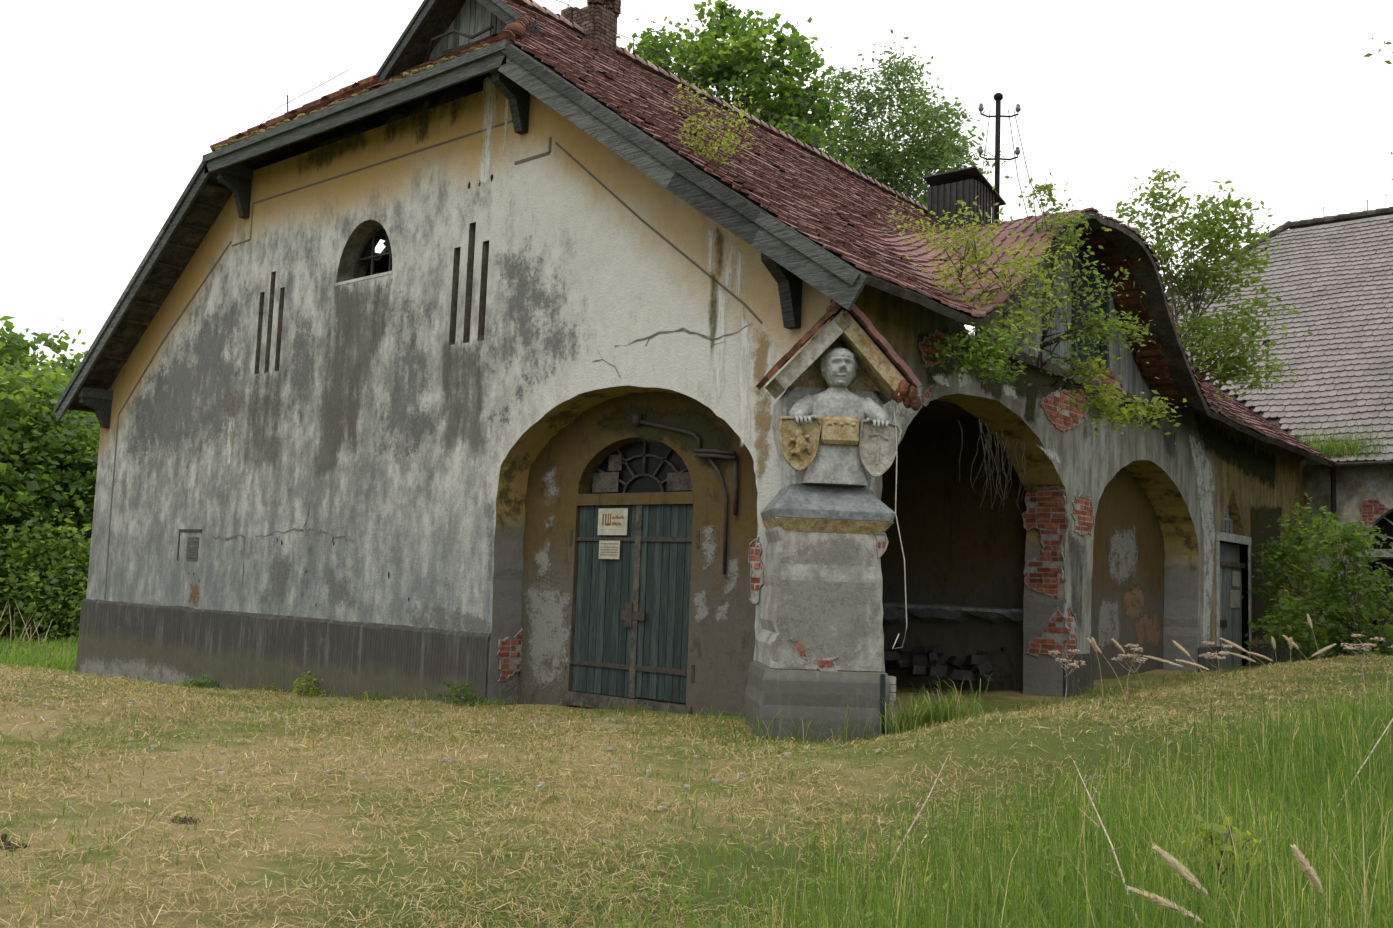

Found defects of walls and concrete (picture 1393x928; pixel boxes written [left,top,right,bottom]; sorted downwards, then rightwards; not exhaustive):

leakage [126,235,576,474]
crack [592,323,752,377]
leakage [707,228,775,443]
flaking render [883,328,971,429]
flaking render [1003,385,1017,399]
flaking render [1041,447,1060,464]
flaking render [1040,367,1124,433]
flaking render [495,468,571,705]
flaking render [1022,486,1095,659]
flaking render [1097,528,1138,651]